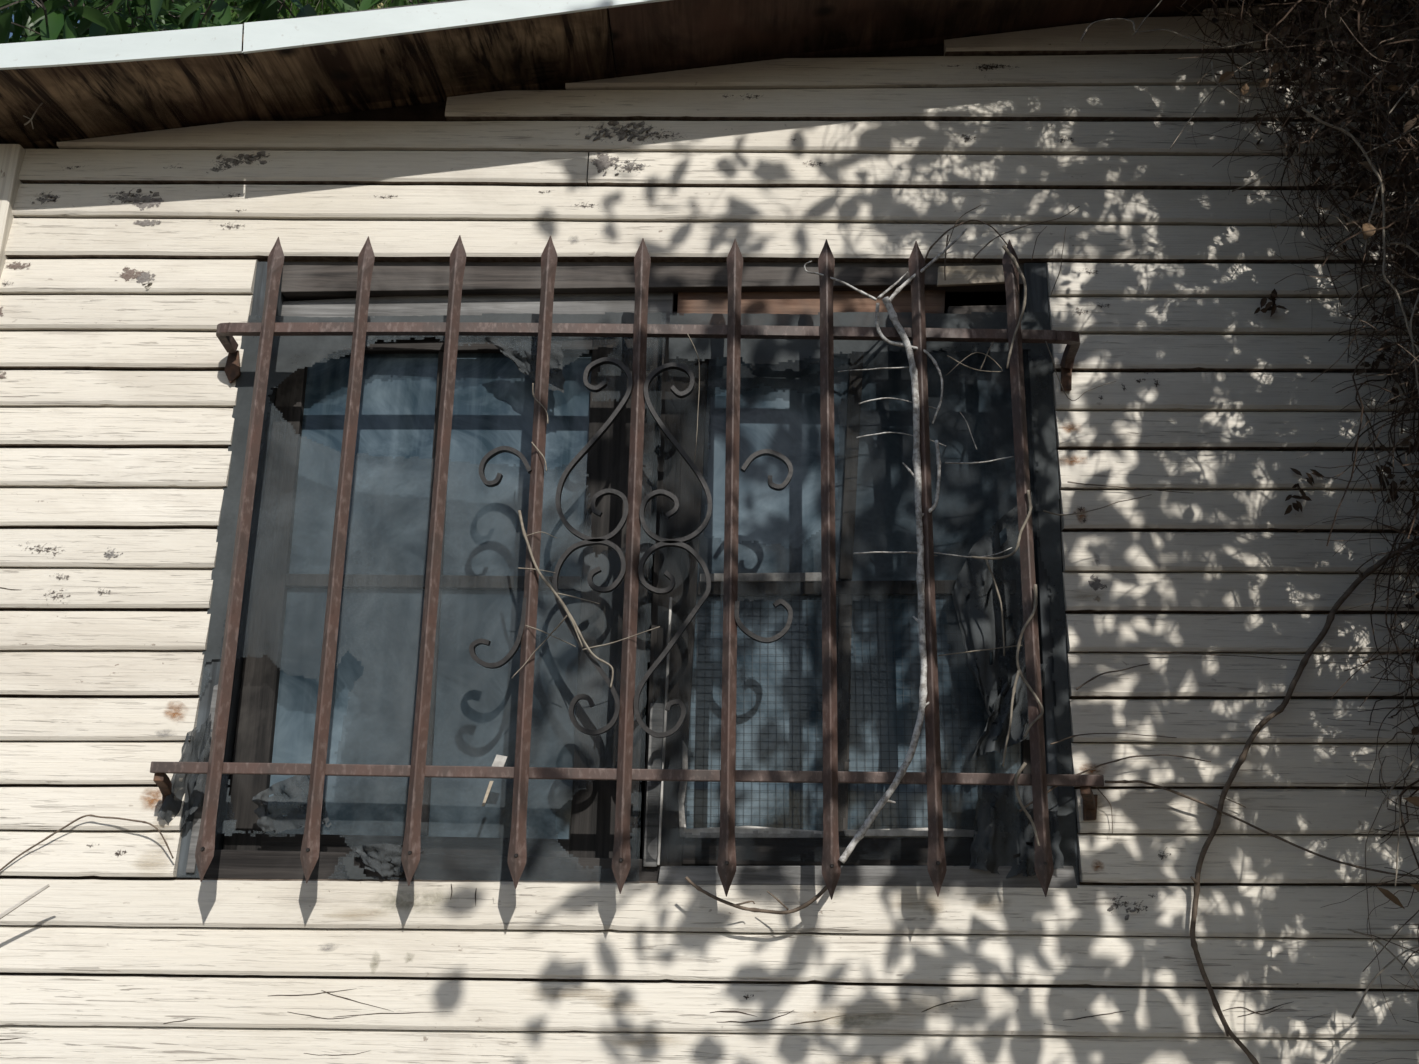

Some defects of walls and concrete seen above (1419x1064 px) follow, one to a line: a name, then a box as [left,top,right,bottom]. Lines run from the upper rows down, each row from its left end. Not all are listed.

peeling [207,151,270,173]
peeling [577,121,683,177]
peeling [109,188,163,226]
peeling [116,267,156,289]
crack [270,988,453,1019]
crack [304,1049,368,1057]